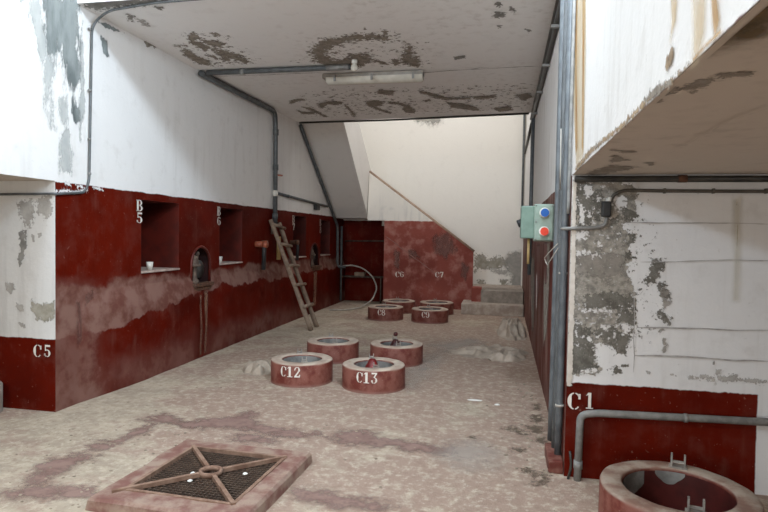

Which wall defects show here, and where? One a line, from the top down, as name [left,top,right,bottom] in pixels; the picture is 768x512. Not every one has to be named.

rust [695,0,719,50]
peeling [174,31,259,66]
peeling [306,28,430,68]
peeling [289,83,533,117]
peeling [16,0,165,242]
spalling [567,31,754,386]
peeling [687,361,767,384]